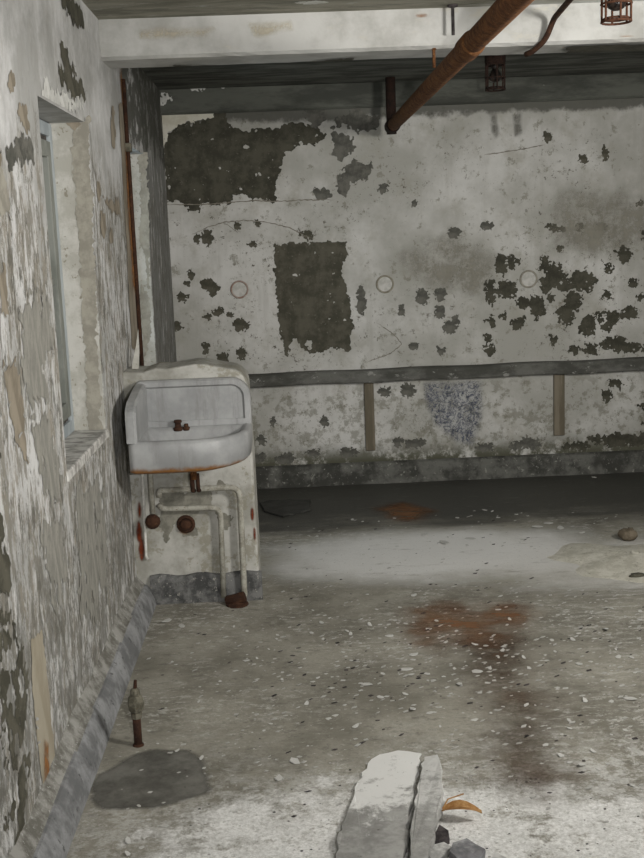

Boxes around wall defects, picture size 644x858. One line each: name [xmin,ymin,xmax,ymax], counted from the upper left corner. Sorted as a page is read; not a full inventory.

peeling [62,0,84,29]
peeling [0,102,35,172]
peeling [160,92,380,213]
peeling [42,40,152,430]
peeling [176,269,251,332]
peeling [273,230,367,357]
peeling [415,288,461,335]
peeling [482,245,644,357]
peeling [561,396,644,452]
peeling [0,513,12,596]
rust [410,604,537,712]
peeling [0,606,55,845]